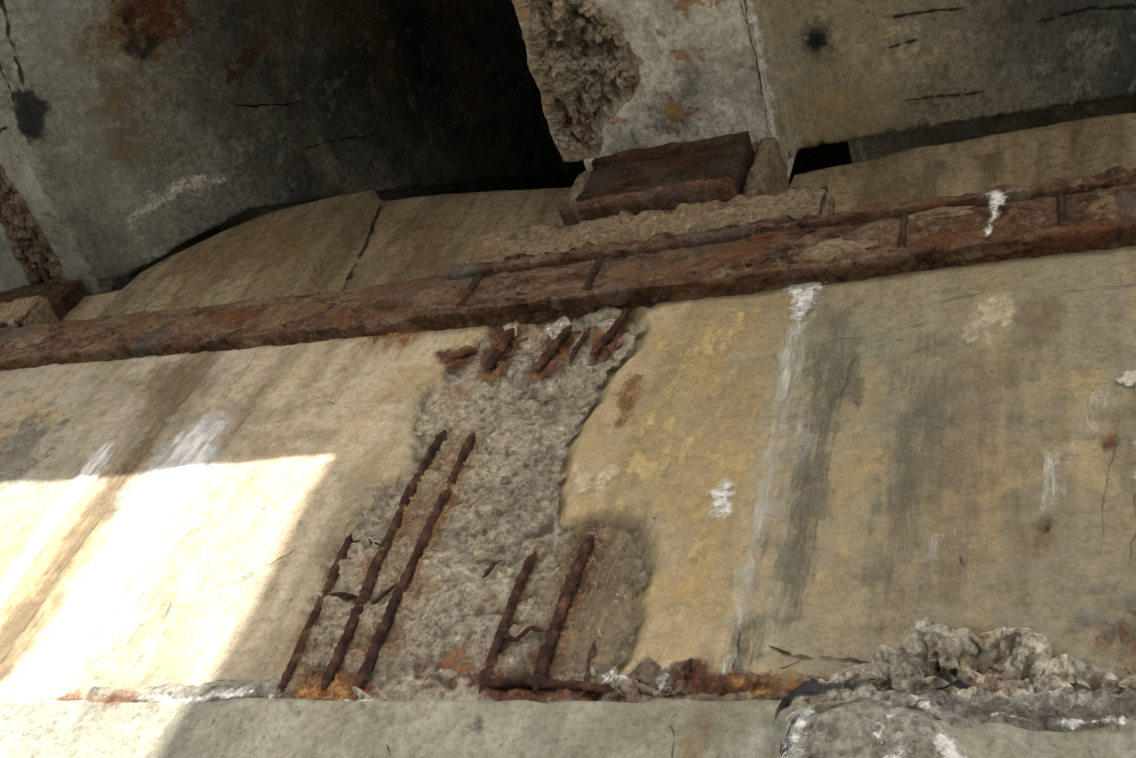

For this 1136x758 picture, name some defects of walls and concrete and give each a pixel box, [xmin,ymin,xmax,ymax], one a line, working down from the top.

crack [0,0,26,133]
rust [78,0,192,59]
spalling [512,0,641,162]
crack [740,0,769,133]
crack [884,7,964,49]
spalling [0,164,67,285]
rust [434,305,640,383]
damp [775,281,868,437]
damp [0,351,225,701]
spalling [278,305,1136,732]
damp [752,444,843,597]
rust [661,659,798,696]